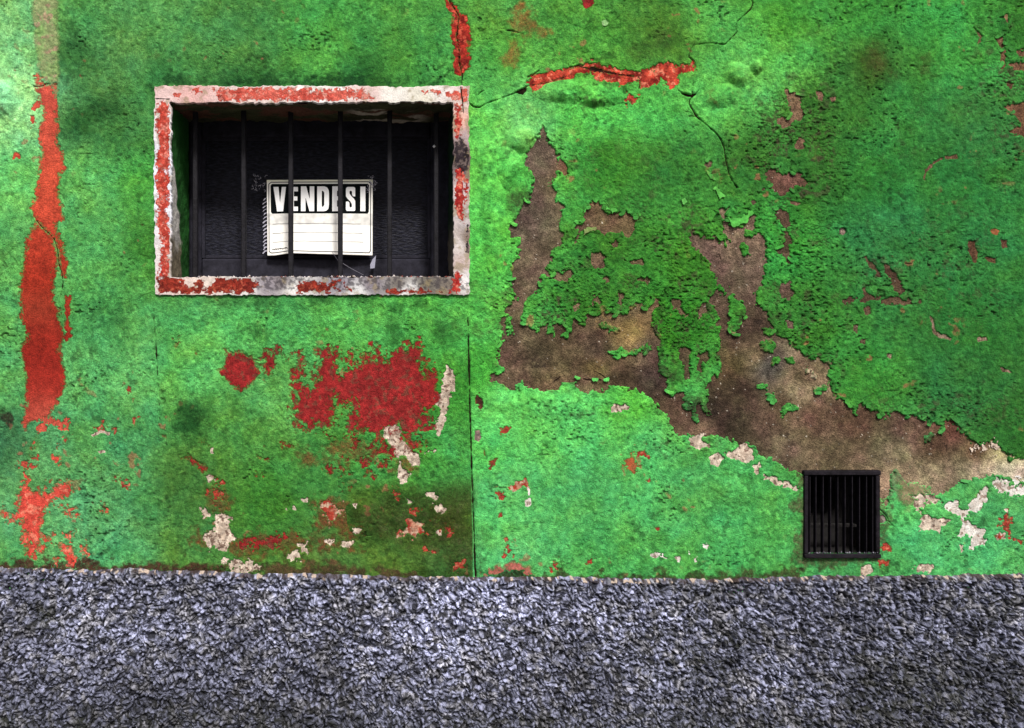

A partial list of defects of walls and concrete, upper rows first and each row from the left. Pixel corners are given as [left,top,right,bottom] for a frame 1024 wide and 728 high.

peeling [154,86,374,295]
peeling [421,0,472,253]
crack [449,0,640,113]
peeling [526,59,697,108]
crack [679,91,737,188]
crack [689,0,753,61]
peeling [777,88,836,129]
peeling [0,73,90,567]
peeling [385,271,463,295]
peeling [489,127,1024,553]
peeling [217,336,455,554]